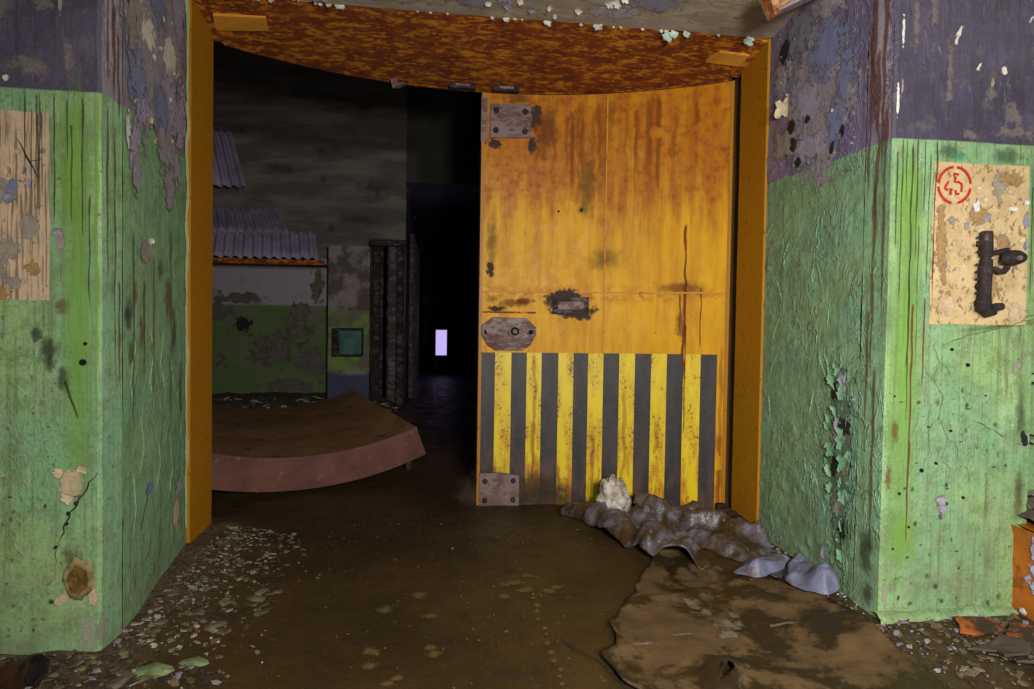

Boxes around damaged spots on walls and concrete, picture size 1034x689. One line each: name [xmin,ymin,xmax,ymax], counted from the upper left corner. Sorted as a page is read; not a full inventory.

peeling [372,0,557,27]
peeling [575,0,689,31]
peeling [659,30,691,43]
peeling [117,0,190,211]
rust [528,105,543,154]
peeling [772,0,869,196]
rust [679,226,687,430]
crack [922,315,1034,491]
peeling [52,464,88,505]
peeling [820,363,858,563]
spalling [50,556,99,606]